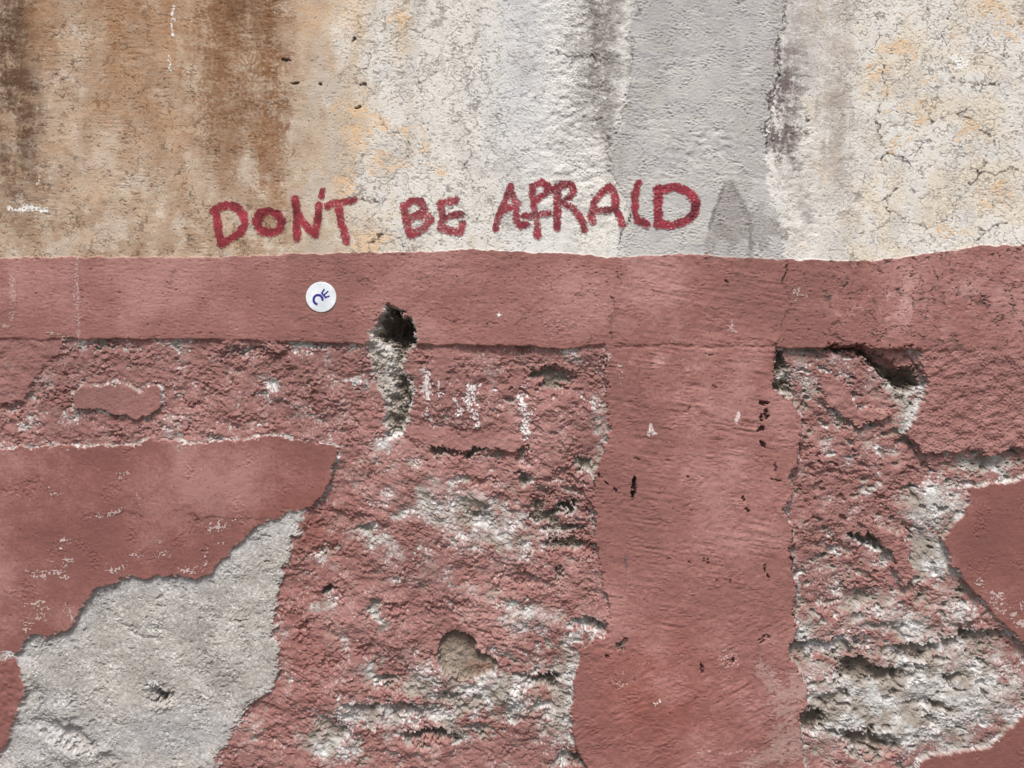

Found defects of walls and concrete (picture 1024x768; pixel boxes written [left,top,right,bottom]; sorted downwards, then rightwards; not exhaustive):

water stain [481,0,942,259]
crack [868,6,1021,241]
spalling [0,311,628,768]
spalling [718,347,1024,768]